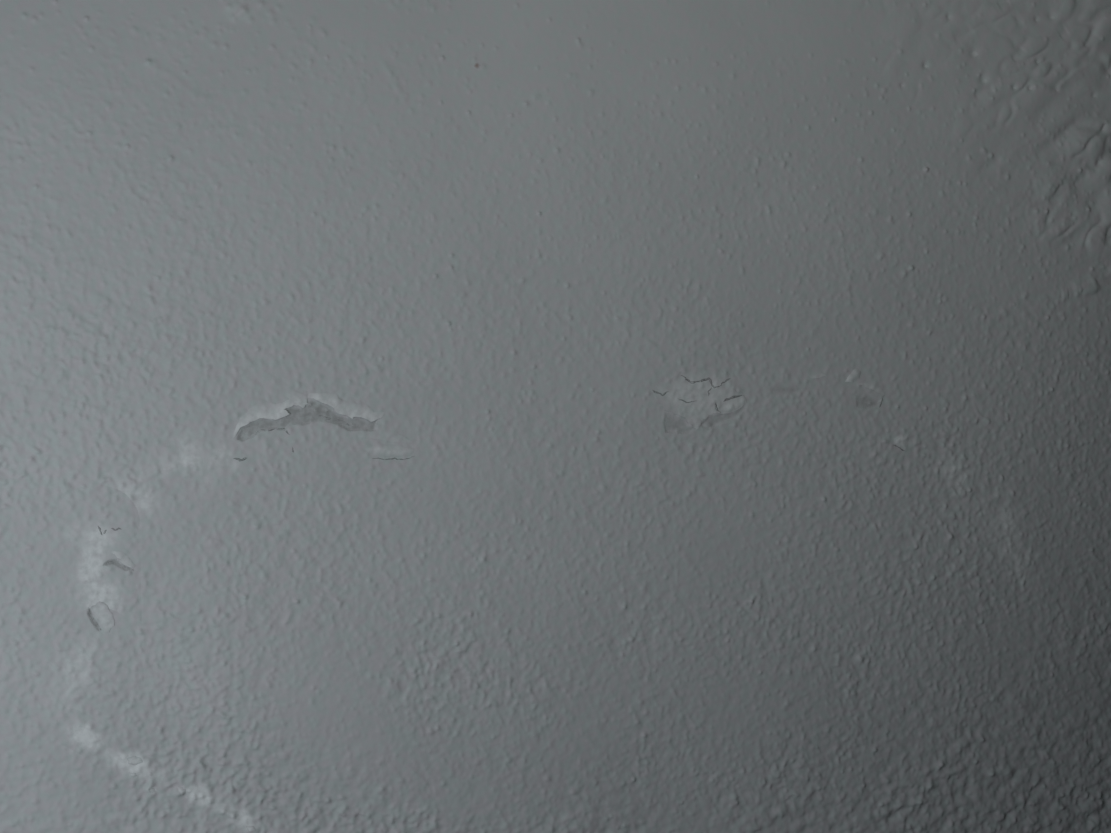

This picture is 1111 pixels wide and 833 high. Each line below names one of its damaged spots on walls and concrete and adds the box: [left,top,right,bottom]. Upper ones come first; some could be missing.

peeling [234,389,415,460]